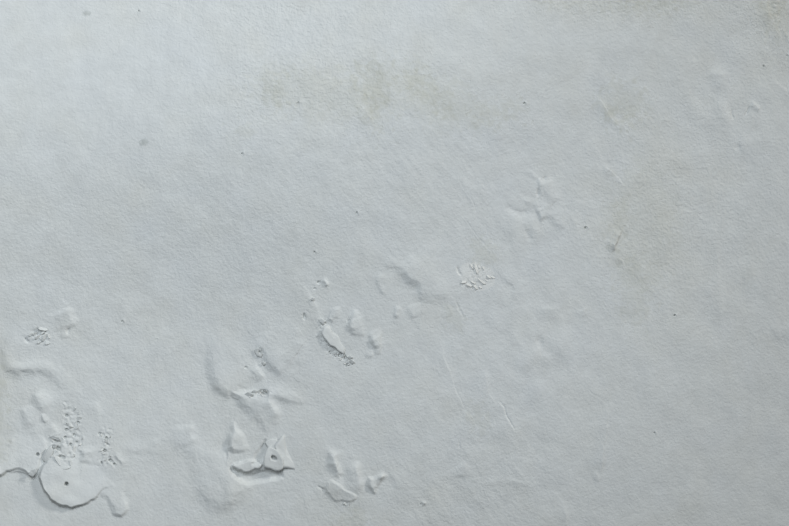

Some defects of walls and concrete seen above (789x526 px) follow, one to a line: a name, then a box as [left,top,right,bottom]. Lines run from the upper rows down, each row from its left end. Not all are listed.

spalling [294,276,355,368]
spalling [42,407,127,470]
peeling [220,435,295,506]